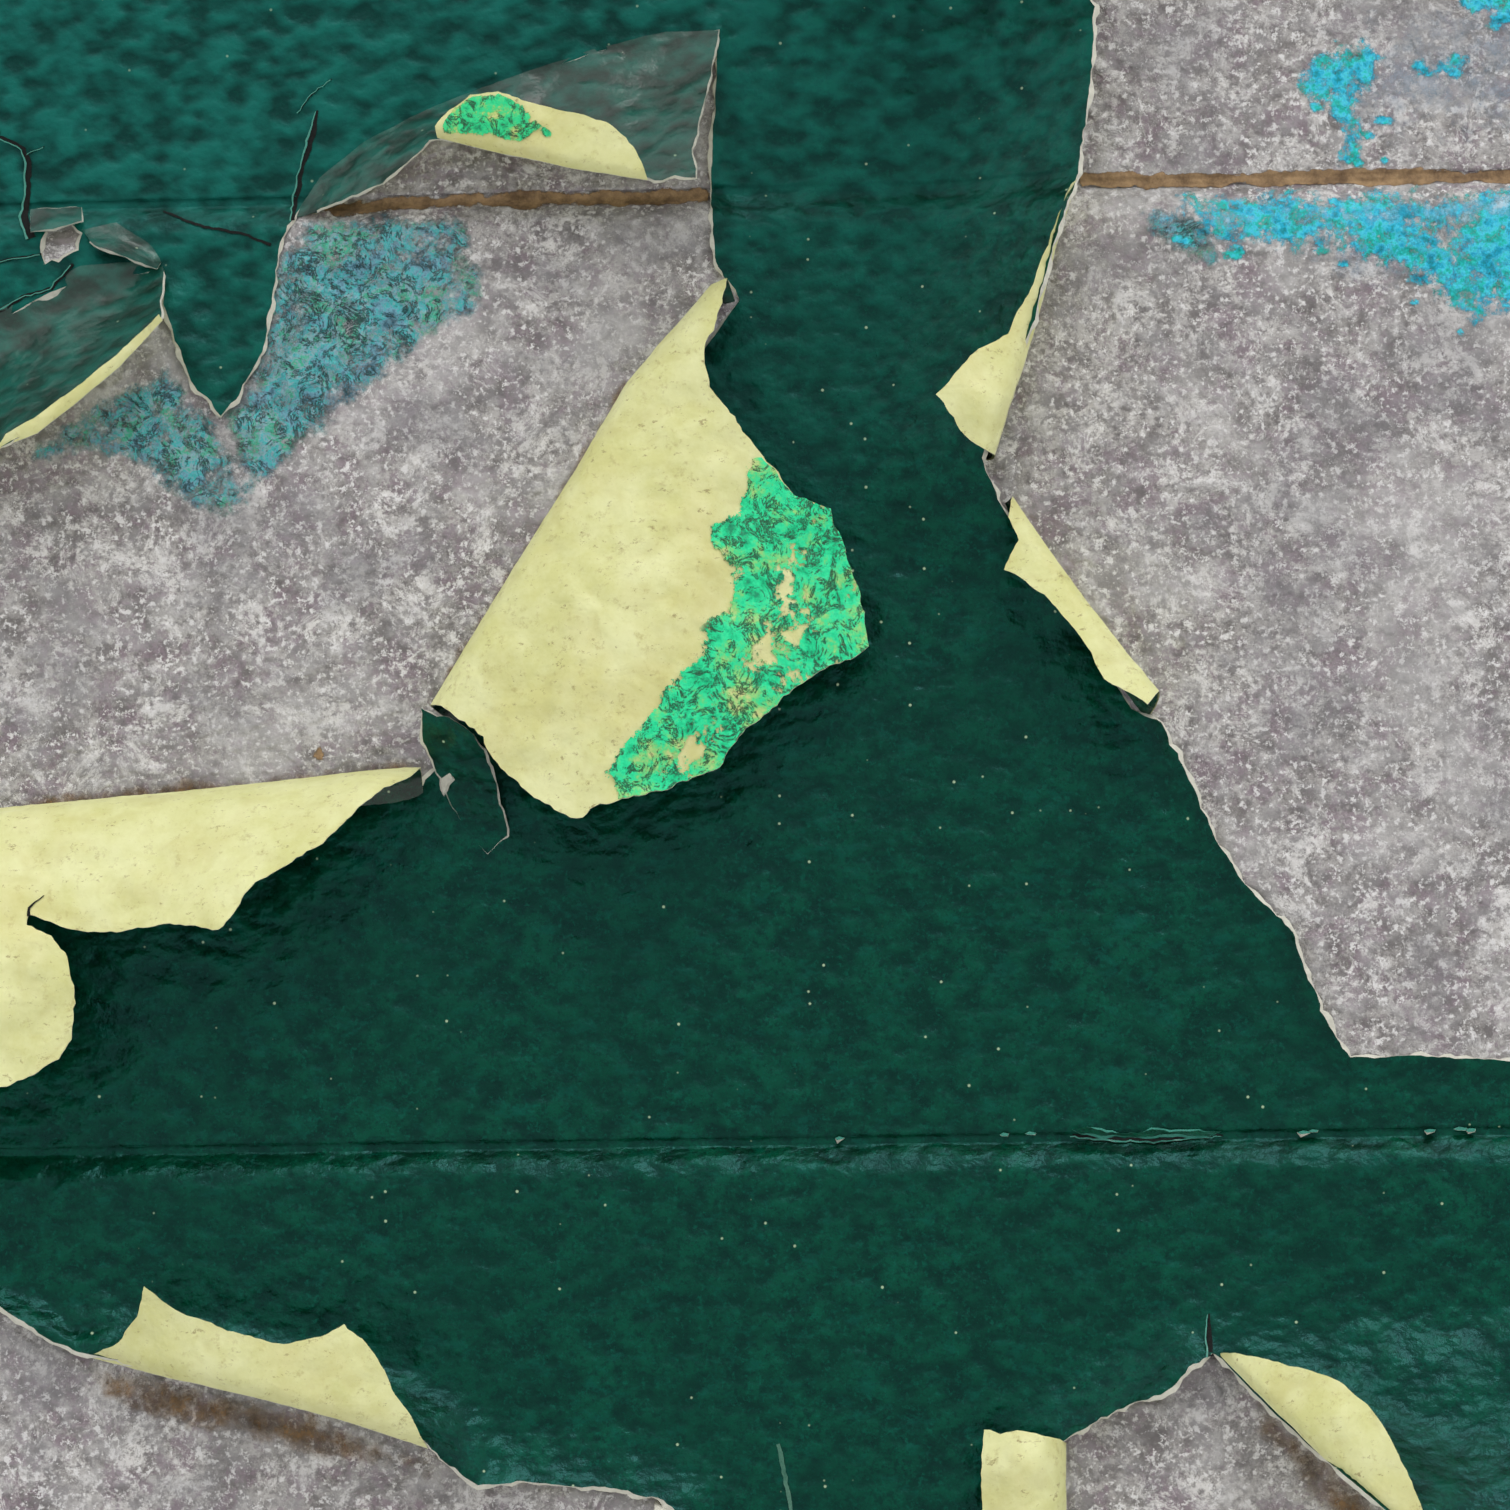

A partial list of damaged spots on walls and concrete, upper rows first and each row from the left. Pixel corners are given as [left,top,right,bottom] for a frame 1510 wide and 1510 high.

crack [0,136,74,312]
crack [163,79,332,246]
peeling [0,30,869,1087]
peeling [936,0,1510,1059]
peeling [1072,1127,1221,1139]
peeling [0,1287,666,1510]
peeling [981,1353,1422,1510]